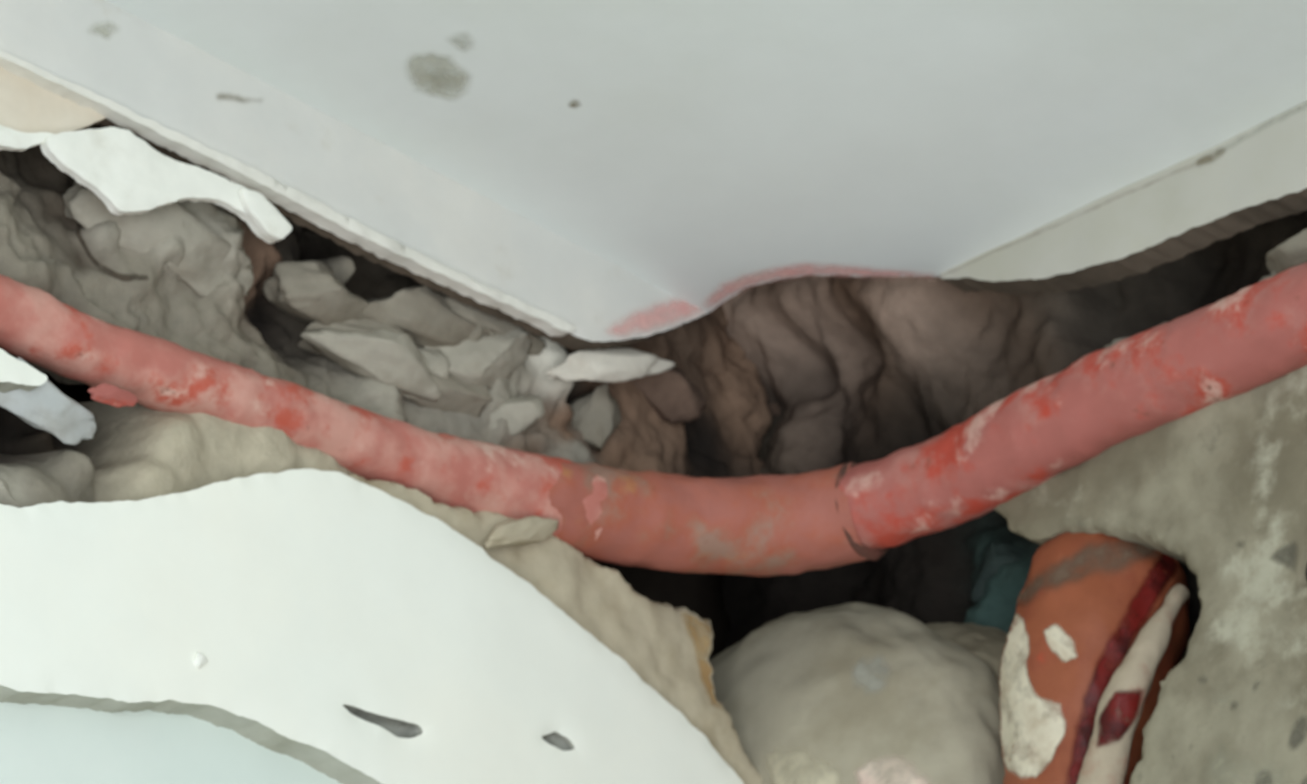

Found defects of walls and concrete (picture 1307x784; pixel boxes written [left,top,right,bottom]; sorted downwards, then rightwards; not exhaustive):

damp [412,56,465,95]
spalling [0,123,1307,478]
spalling [0,353,353,508]
peeling [723,365,1307,784]
hole [343,705,421,738]